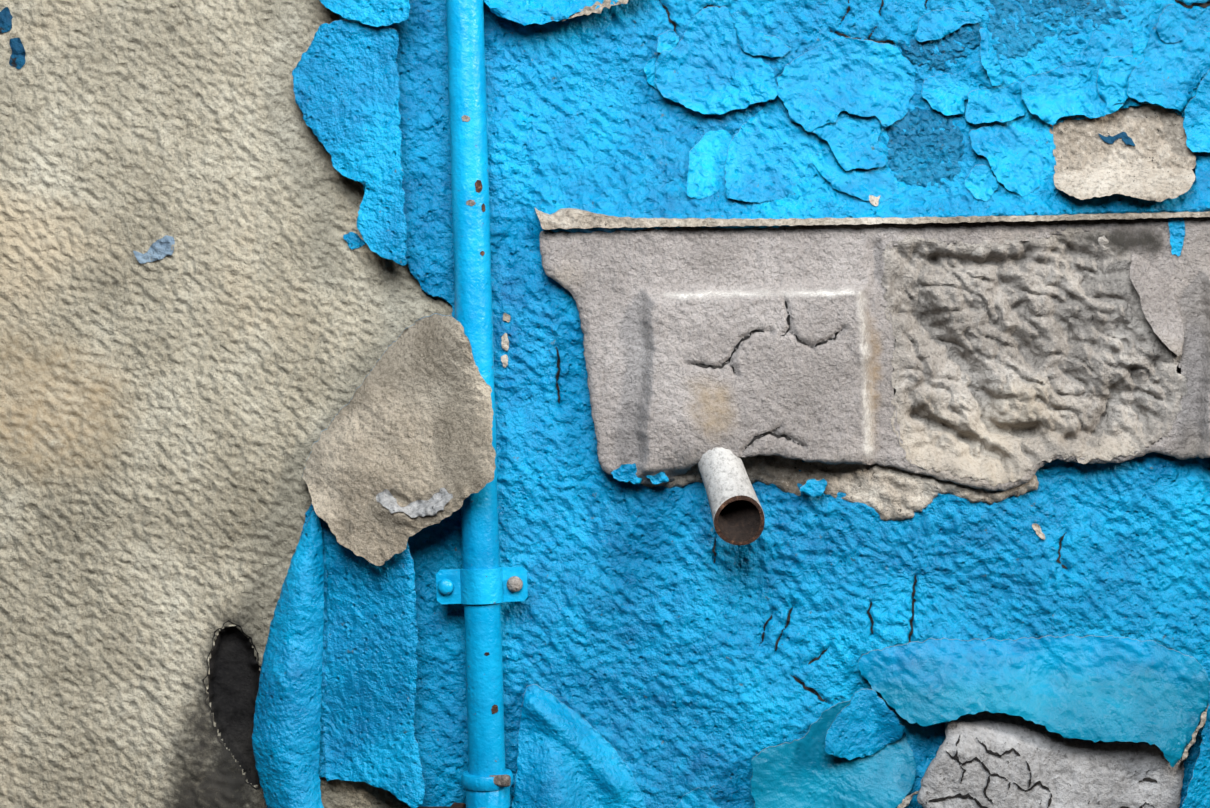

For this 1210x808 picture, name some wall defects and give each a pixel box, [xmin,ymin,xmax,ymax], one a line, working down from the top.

peeling [292,0,410,265]
peeling [484,0,628,26]
peeling [644,4,1210,206]
crack [691,296,842,375]
spalling [881,227,1188,486]
peeling [320,519,425,808]
peeling [674,788,721,808]
peeling [750,635,1210,808]